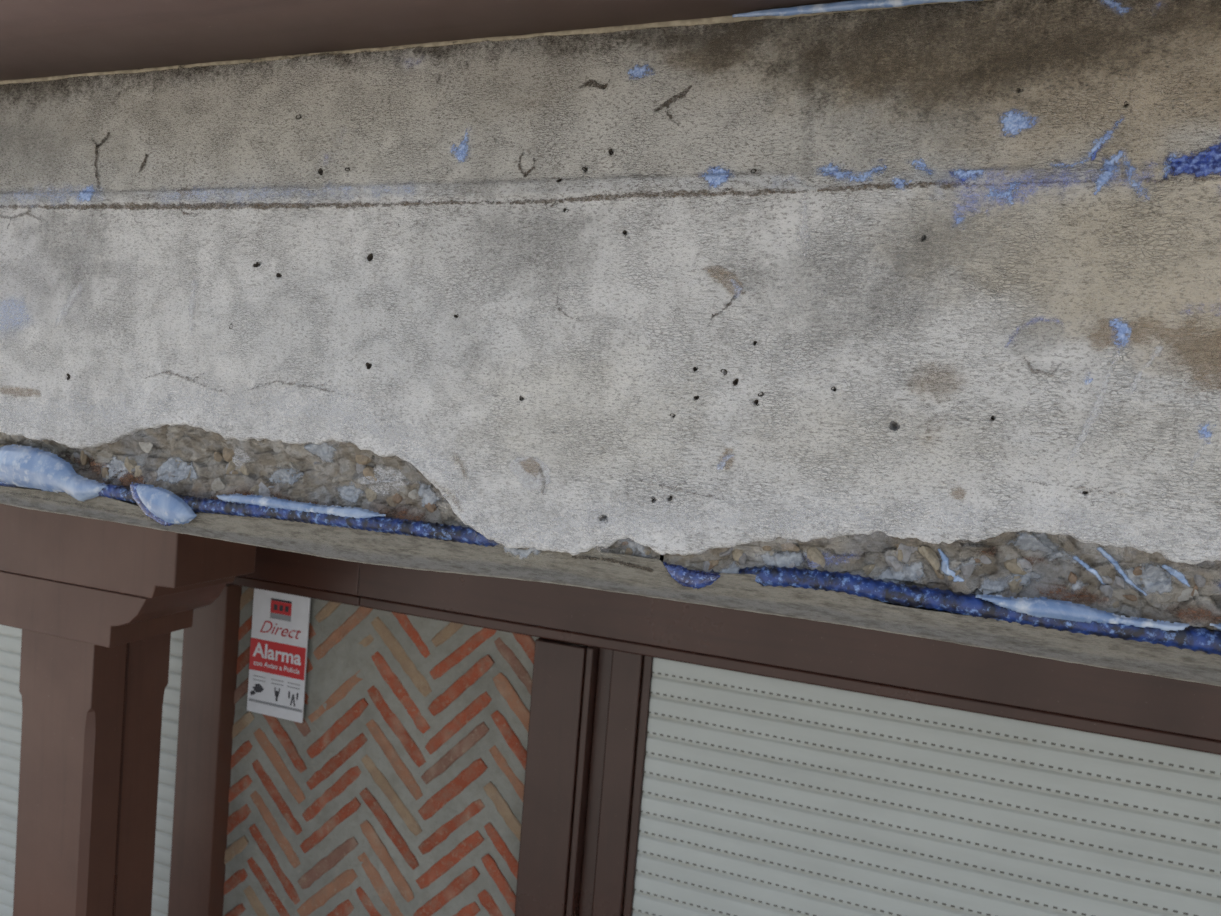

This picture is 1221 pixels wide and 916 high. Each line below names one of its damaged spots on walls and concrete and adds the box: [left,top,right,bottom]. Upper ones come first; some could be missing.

damp [514,0,1221,115]
spalling [0,424,472,528]
spalling [601,530,1221,631]